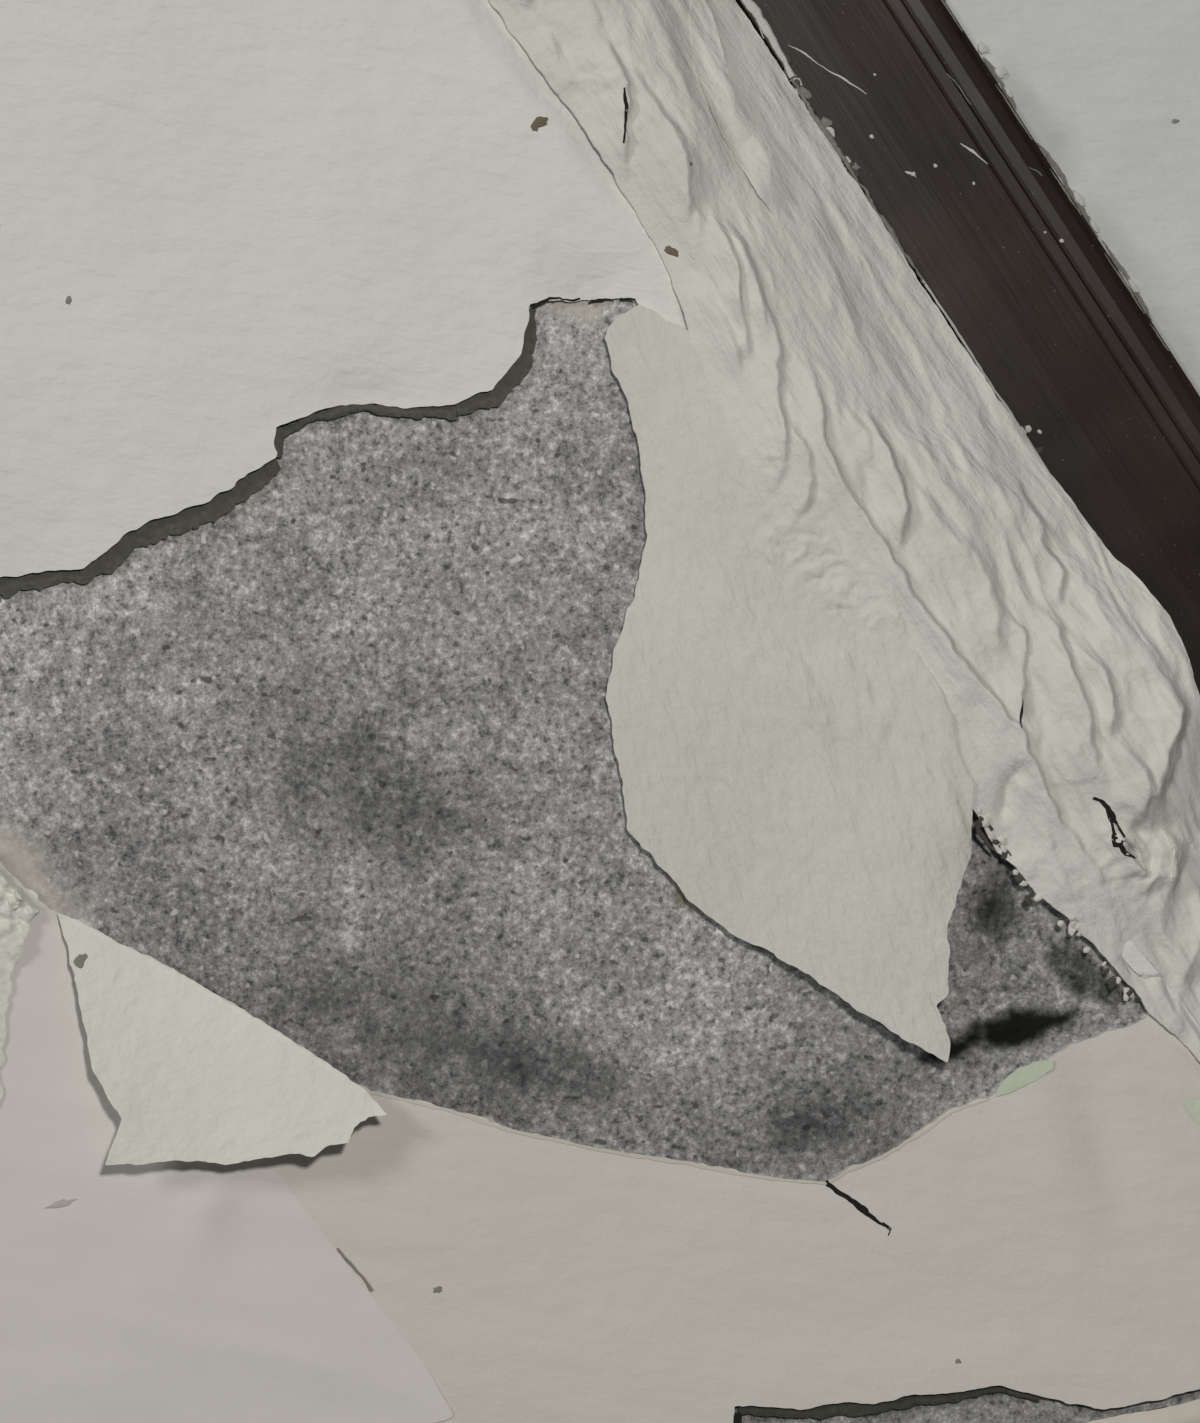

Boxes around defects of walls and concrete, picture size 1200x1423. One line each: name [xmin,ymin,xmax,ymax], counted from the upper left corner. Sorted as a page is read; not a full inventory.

peeling [0,299,1200,1423]
damp [1053,949,1119,998]
damp [922,1009,1075,1061]
crack [825,1180,892,1236]